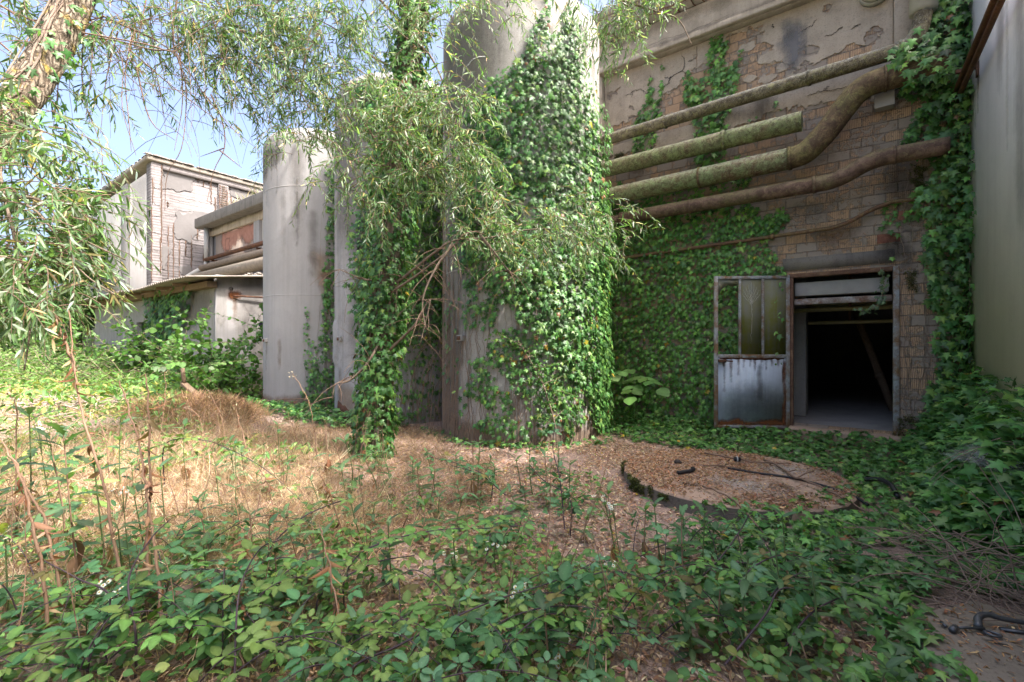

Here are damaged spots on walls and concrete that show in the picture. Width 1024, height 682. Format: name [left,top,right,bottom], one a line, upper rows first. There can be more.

crack [626,20,717,96]
peeling [605,0,893,159]
damp [782,23,804,67]
spalling [150,164,204,282]
spalling [197,179,233,211]
peeling [222,223,254,251]
corrosion [718,358,786,426]